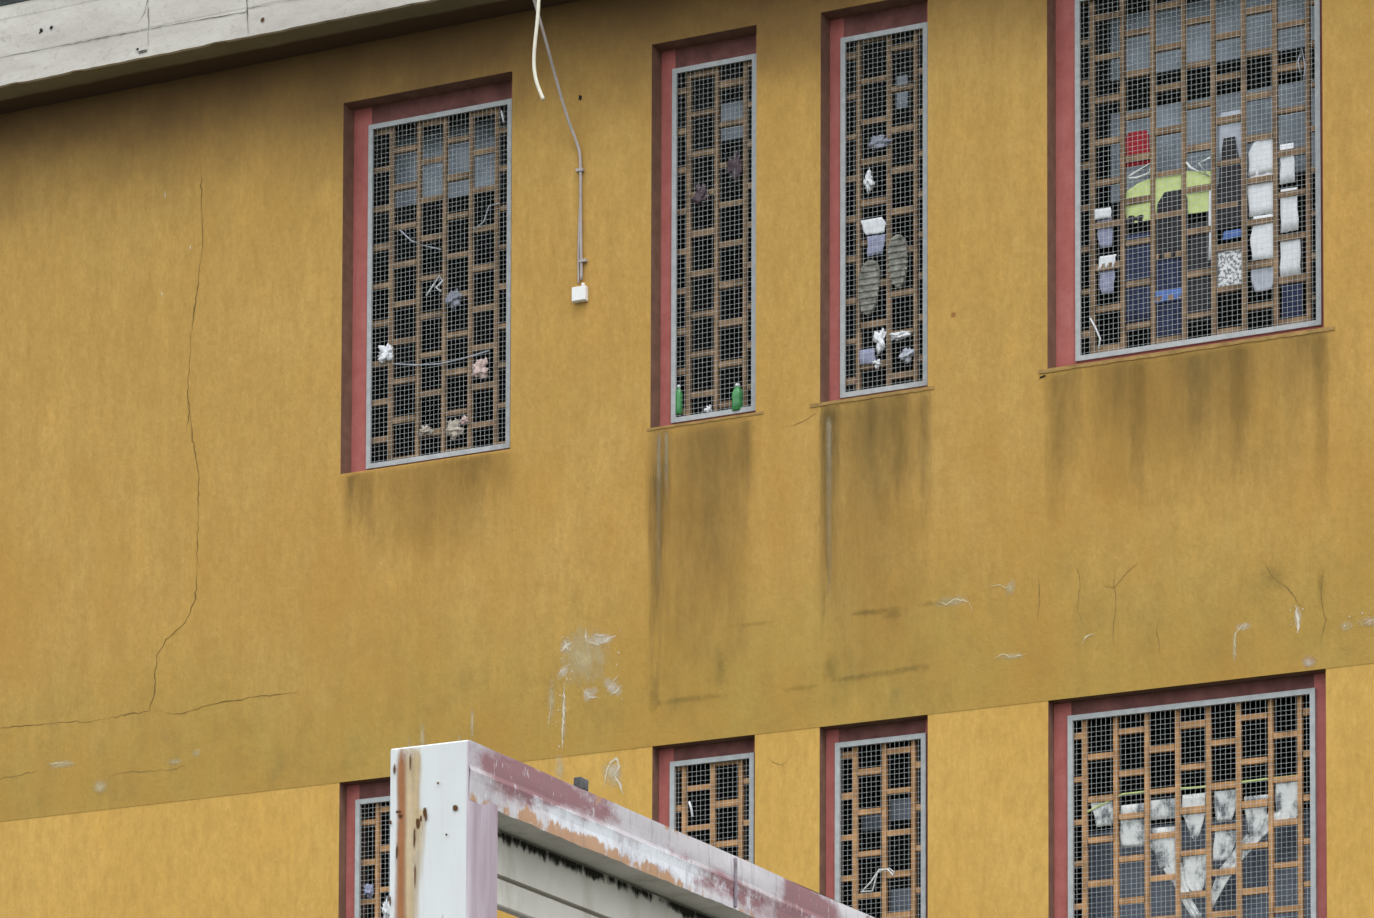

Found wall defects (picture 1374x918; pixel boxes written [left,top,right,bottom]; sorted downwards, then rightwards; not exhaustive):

crack [3,148,296,728]
peeling [548,628,623,773]